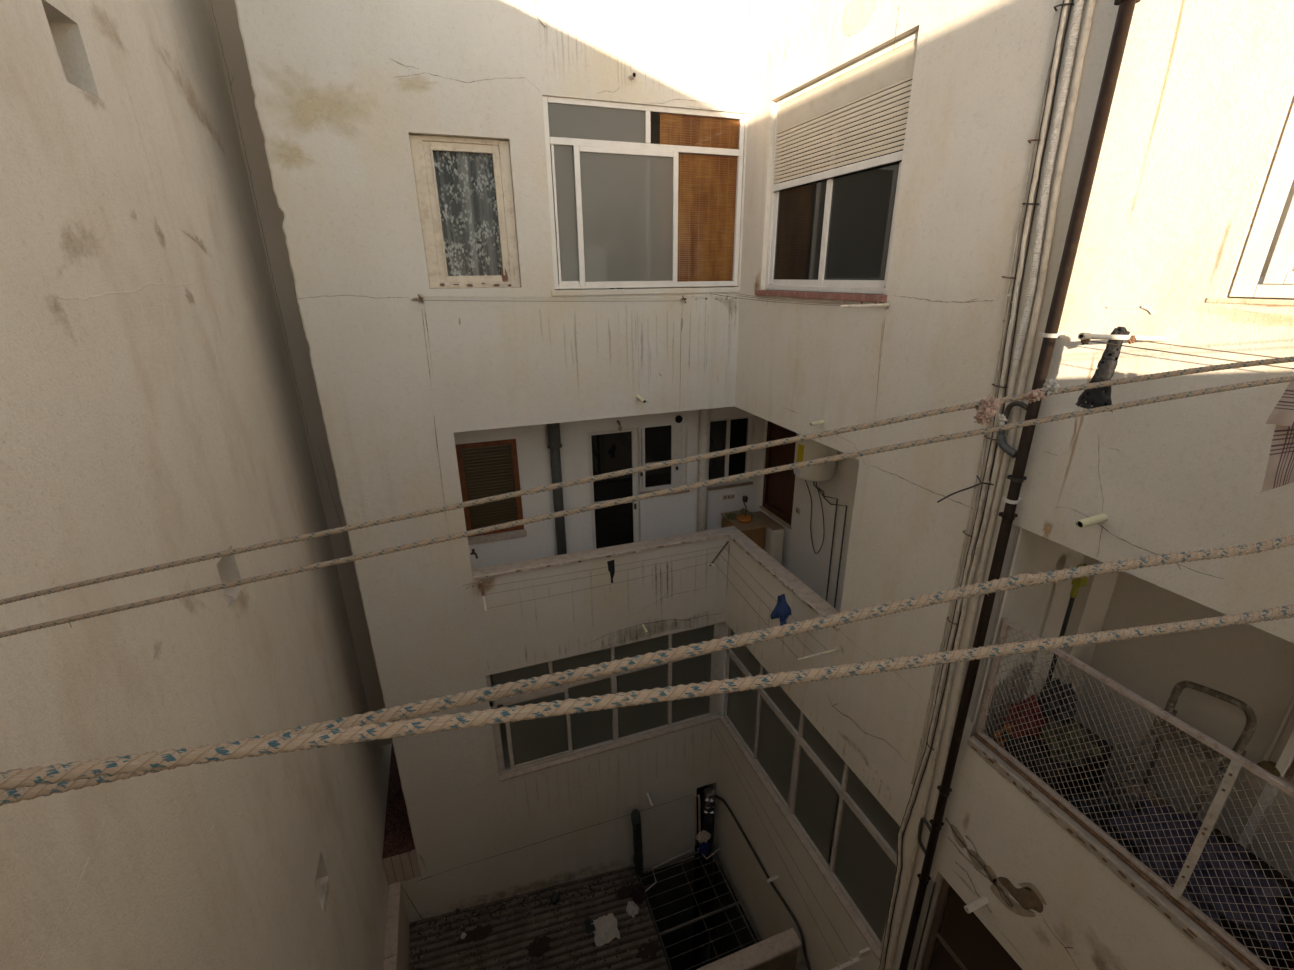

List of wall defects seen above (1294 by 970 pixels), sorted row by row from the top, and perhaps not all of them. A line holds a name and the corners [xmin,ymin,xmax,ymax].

peeling [971,746,1235,970]